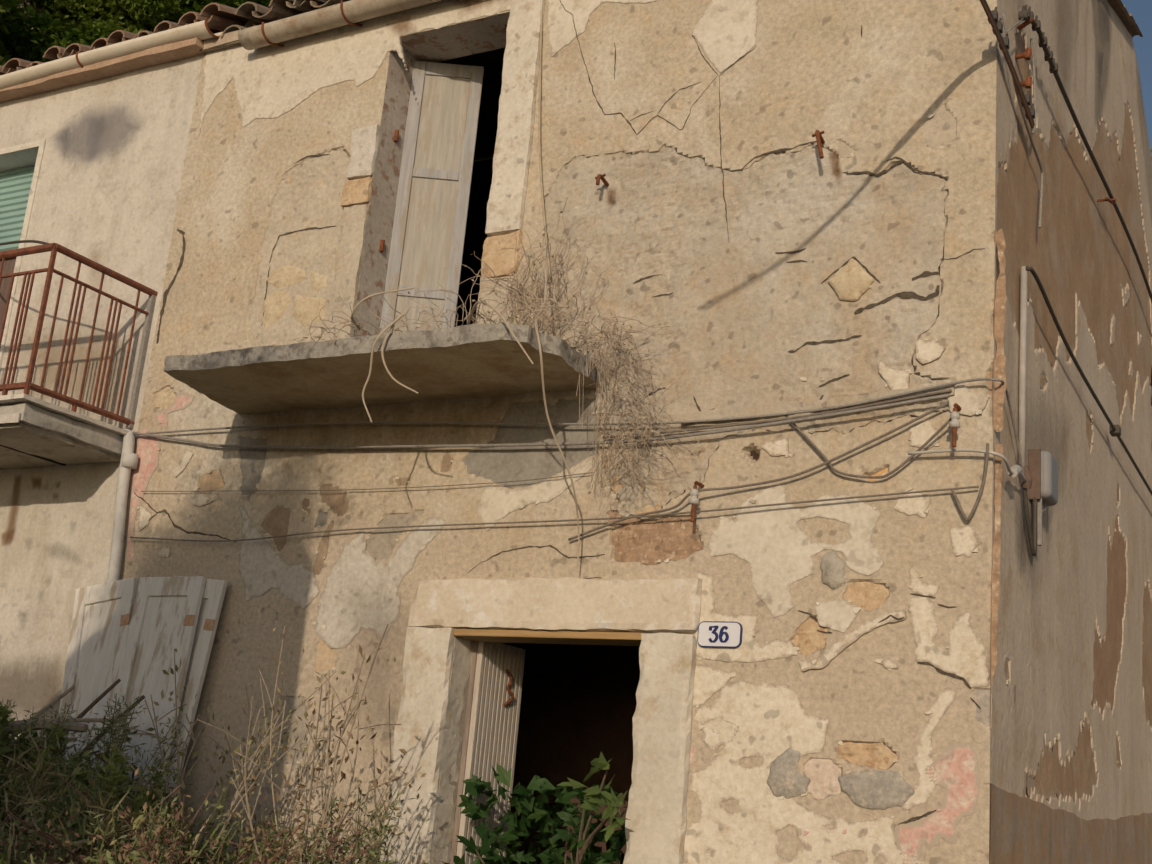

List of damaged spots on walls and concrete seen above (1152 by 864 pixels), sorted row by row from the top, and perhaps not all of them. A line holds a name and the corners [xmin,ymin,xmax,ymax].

water stain [62,115,129,156]
peeling [199,0,512,136]
crack [560,1,817,239]
spalling [248,147,350,344]
corrosion [6,478,20,541]
peeling [125,425,194,563]
spalling [189,470,225,506]
peeling [237,436,446,673]
spalling [439,29,1152,864]